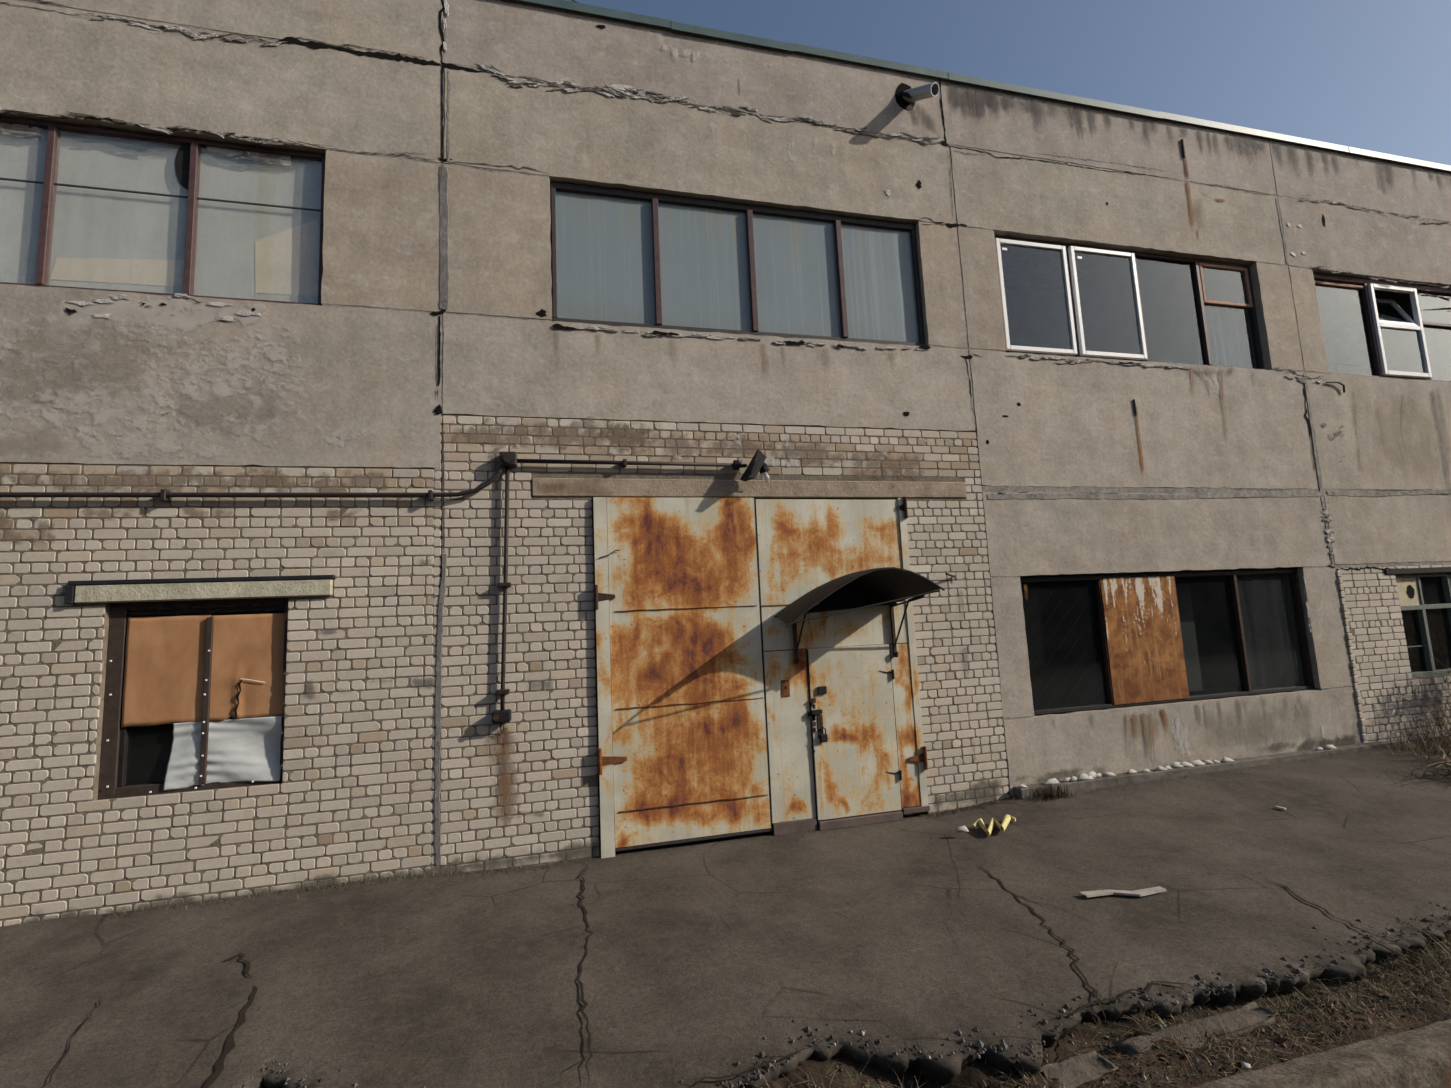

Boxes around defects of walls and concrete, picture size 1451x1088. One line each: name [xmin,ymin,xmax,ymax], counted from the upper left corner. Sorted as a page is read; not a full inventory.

crack [0,0,148,25]
crack [439,0,449,63]
crack [329,148,545,175]
flaking render [0,293,304,447]
spalling [536,309,931,351]
rust [1100,576,1189,759]
rust [498,727,518,821]
leakage [1271,726,1355,751]
crack [567,863,594,1086]
crack [41,998,101,1088]
crack [203,952,258,1088]